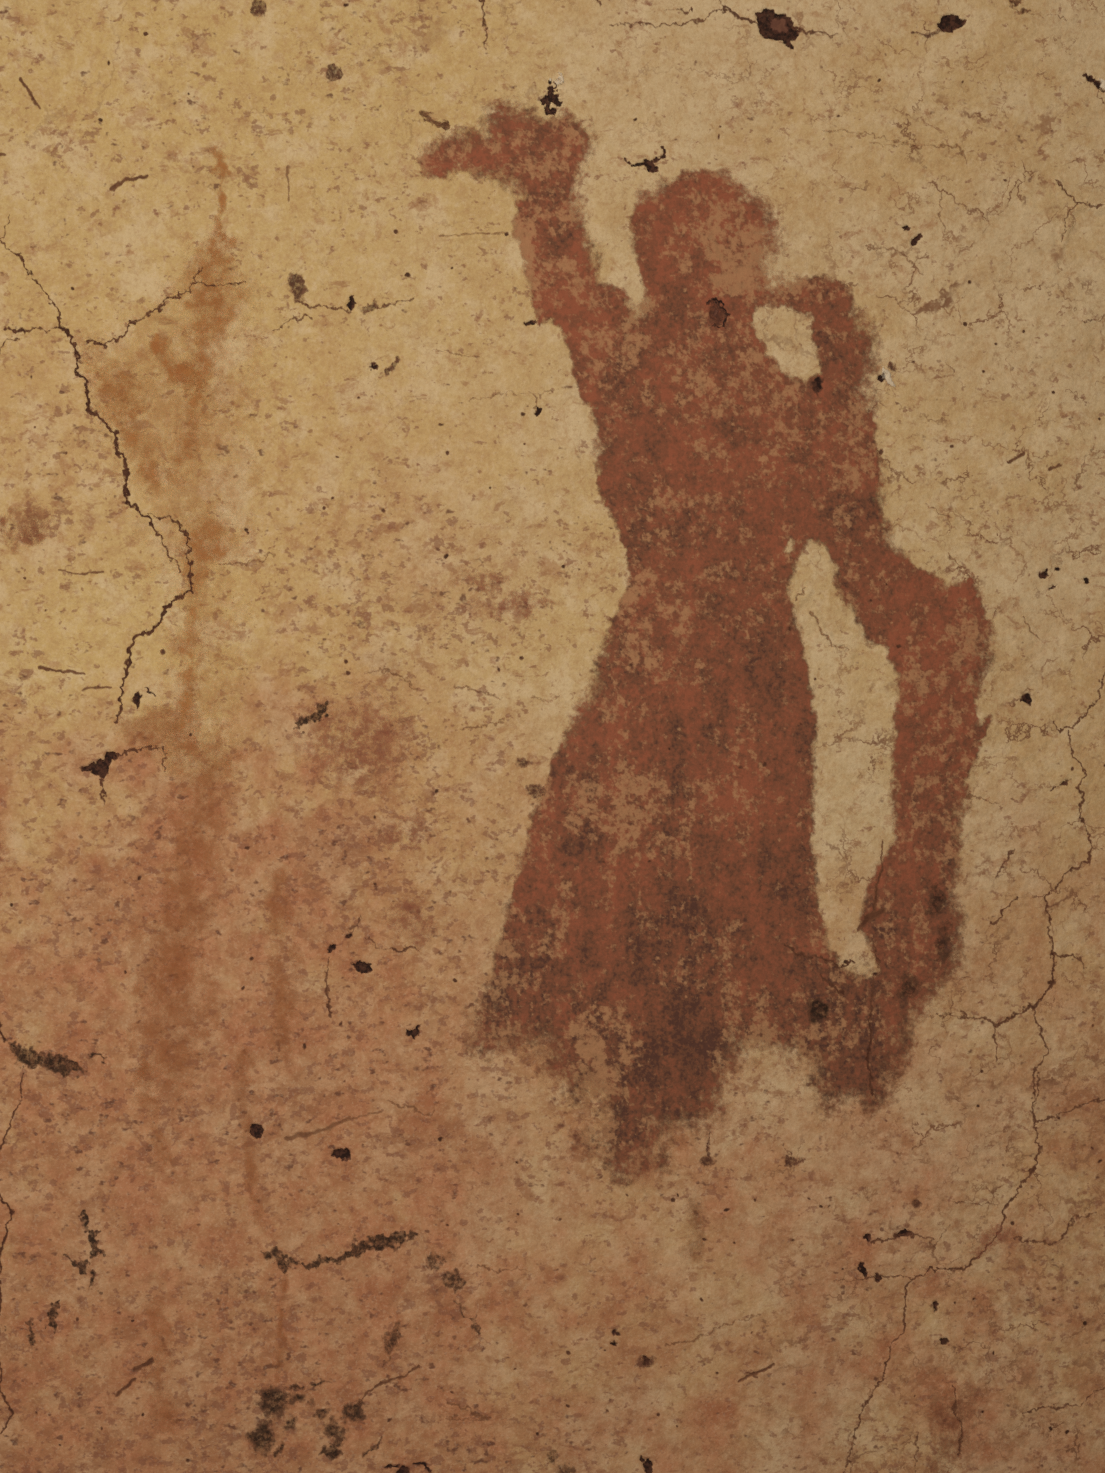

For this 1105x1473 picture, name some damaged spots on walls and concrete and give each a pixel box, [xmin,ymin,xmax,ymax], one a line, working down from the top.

crack [479,0,488,44]
crack [597,0,834,38]
crack [0,217,246,802]
crack [842,675,1105,1473]
crack [0,1076,23,1150]
crack [0,1194,15,1311]
crack [0,1363,14,1433]